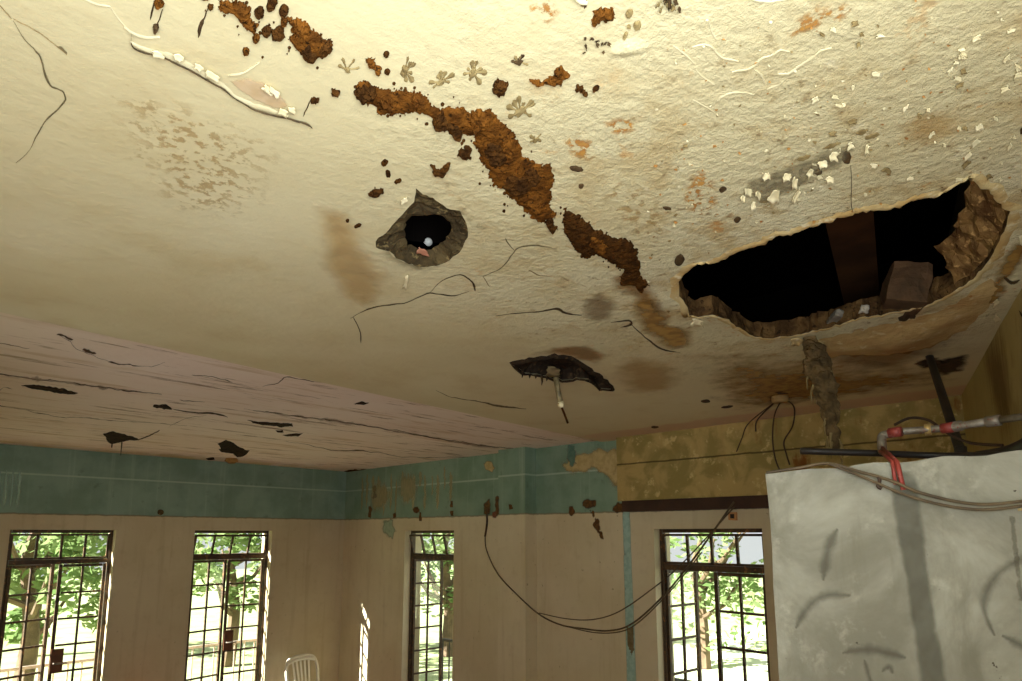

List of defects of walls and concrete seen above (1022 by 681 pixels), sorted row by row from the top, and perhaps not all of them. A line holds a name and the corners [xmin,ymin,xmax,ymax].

corrosion [218,0,333,70]
corrosion [655,0,681,13]
crack [0,6,67,163]
corrosion [353,51,656,307]
peeling [740,129,880,211]
spalling [934,181,1007,284]
crack [350,238,555,342]
crack [498,308,582,316]
crack [0,334,200,426]
water stain [729,367,814,405]
water stain [835,356,965,396]
peeling [563,445,617,486]